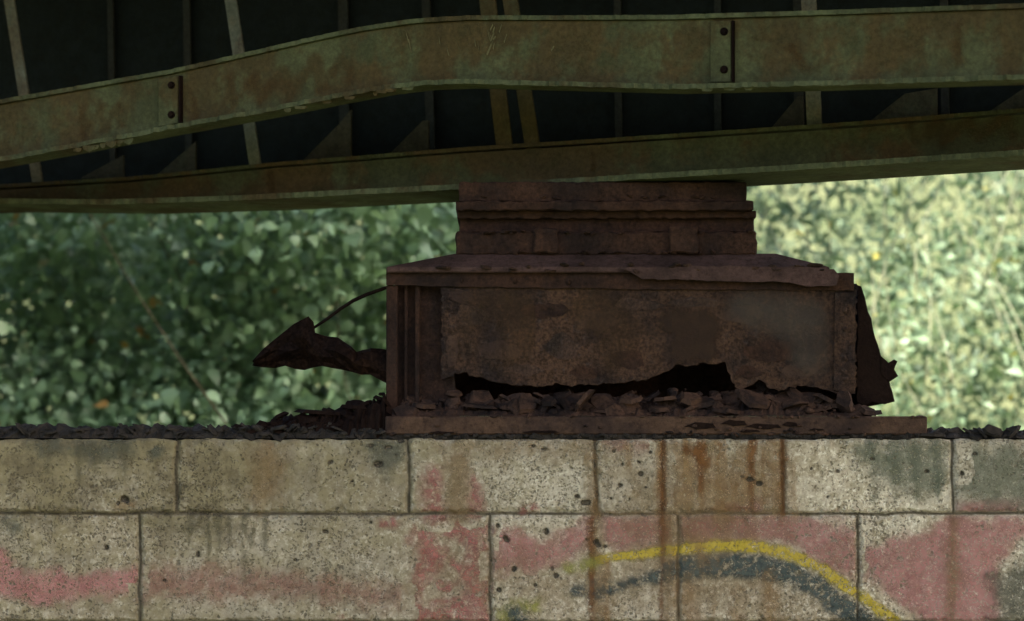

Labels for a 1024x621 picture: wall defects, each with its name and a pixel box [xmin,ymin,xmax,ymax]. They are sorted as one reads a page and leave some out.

rust [658,440,666,553]
rust [684,441,710,491]